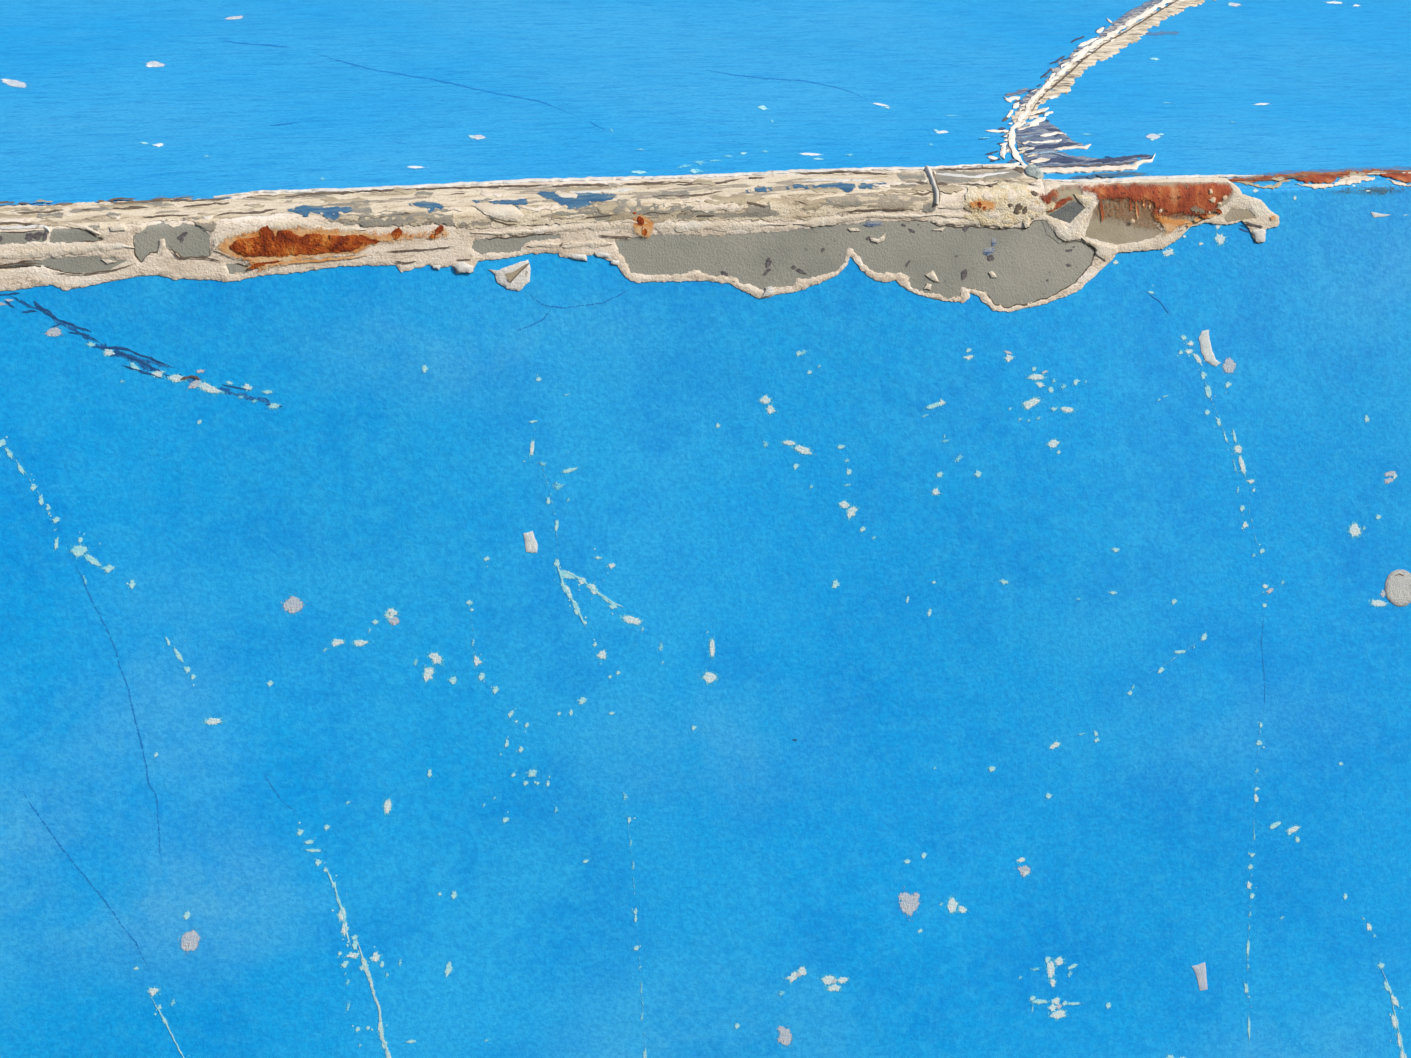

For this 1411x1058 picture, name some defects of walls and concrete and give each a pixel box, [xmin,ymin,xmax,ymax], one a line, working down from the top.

peeling [0,0,1279,312]
corrosion [1039,165,1411,236]
corrosion [213,223,450,274]
peeling [44,326,64,337]
peeling [1178,330,1255,529]
peeling [0,436,117,584]
peeling [1368,569,1411,608]
peeling [296,828,403,1014]
peeling [147,986,175,1027]
peeling [1376,963,1409,1058]